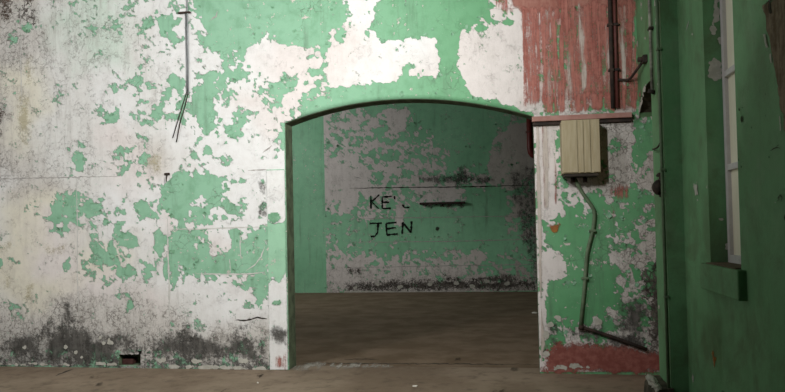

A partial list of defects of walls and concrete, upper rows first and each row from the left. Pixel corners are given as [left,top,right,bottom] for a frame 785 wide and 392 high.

water stain [0,0,36,25]
rust [496,0,638,113]
flaking render [762,0,785,131]
water stain [346,168,537,292]
water stain [0,303,270,377]
water stain [271,326,286,342]
water stain [540,260,660,375]
flaking render [645,368,662,392]